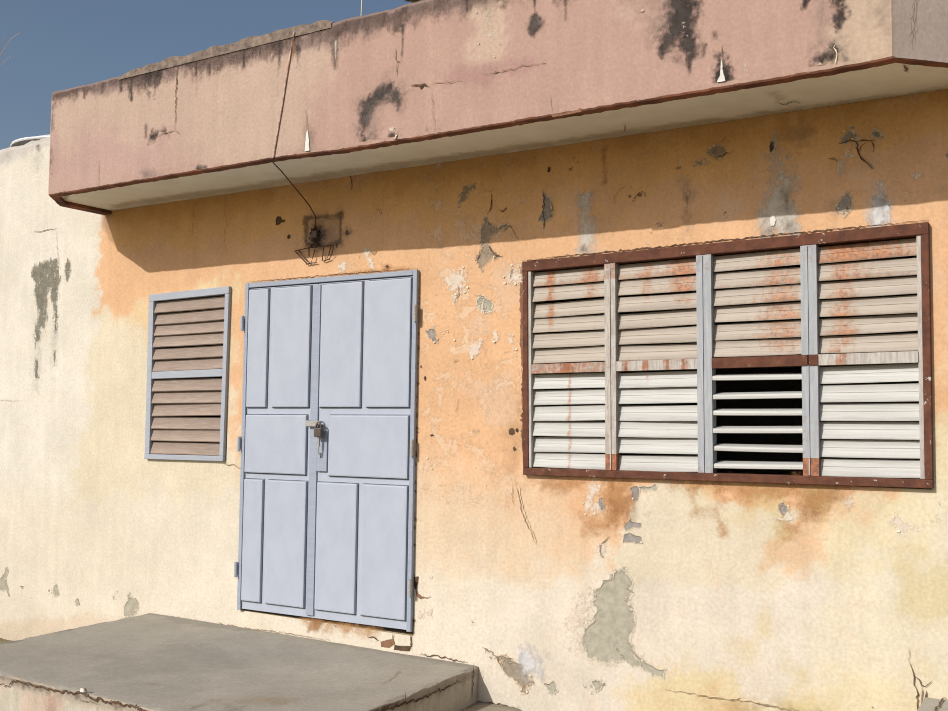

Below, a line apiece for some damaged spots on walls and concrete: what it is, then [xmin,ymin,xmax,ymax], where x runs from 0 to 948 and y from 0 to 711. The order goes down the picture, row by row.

leakage [528,0,542,35]
leakage [659,0,700,69]
leakage [311,0,448,141]
leakage [715,46,732,83]
peeling [475,189,517,272]
spalling [467,263,523,451]
peeling [563,565,667,680]
crack [0,680,162,711]
crack [380,653,518,711]
peeling [482,646,559,695]
crack [663,689,822,711]
crack [908,653,945,711]